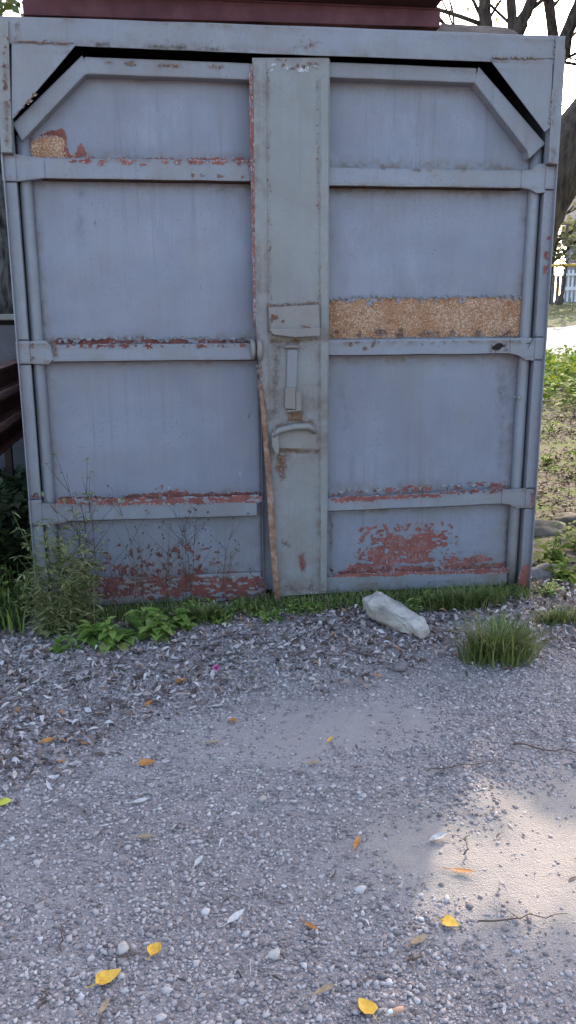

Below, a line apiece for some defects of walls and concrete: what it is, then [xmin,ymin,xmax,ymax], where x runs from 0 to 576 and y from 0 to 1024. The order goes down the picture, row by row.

peeling [51,66,256,349]